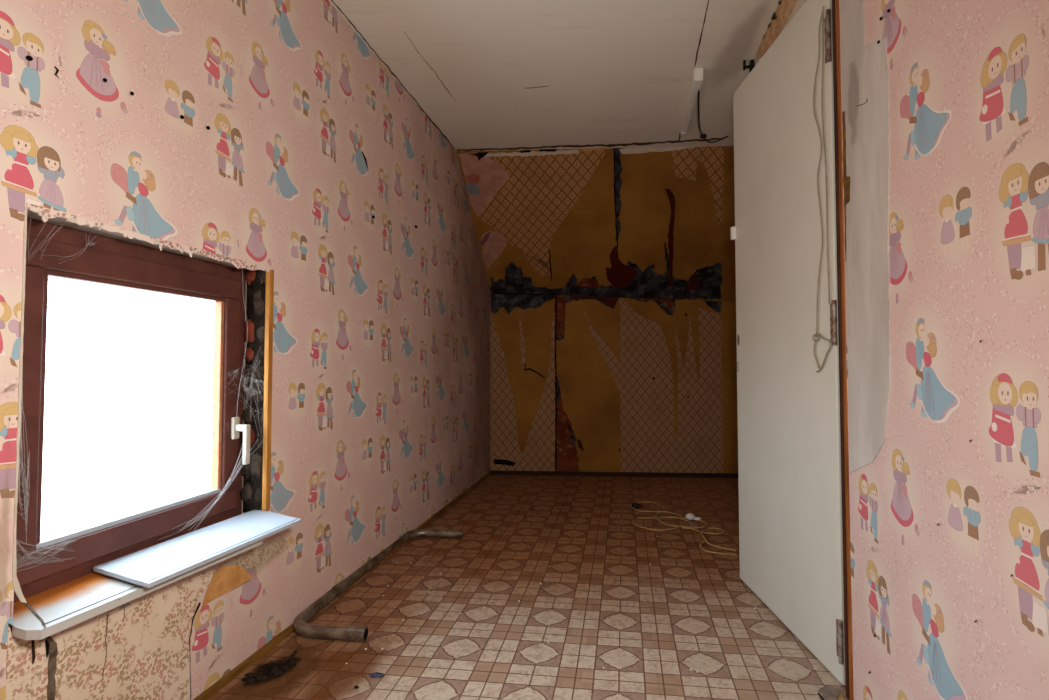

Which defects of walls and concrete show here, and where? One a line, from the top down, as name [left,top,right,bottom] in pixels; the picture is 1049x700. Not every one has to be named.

crack [331,0,721,247]
peeling [484,146,702,157]
peeling [153,239,193,257]